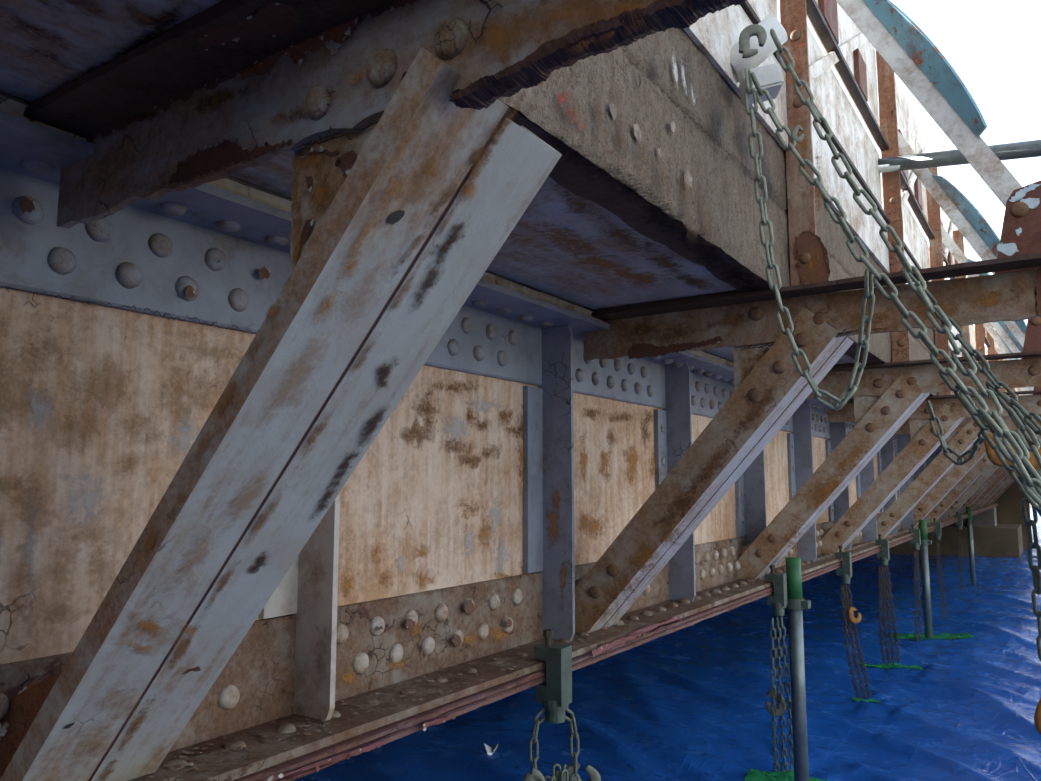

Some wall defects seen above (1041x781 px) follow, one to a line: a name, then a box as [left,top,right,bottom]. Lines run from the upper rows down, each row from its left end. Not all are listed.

crack [469,0,503,45]
peeling [162,137,357,185]
rust [392,0,746,309]
peeling [1009,183,1041,209]
peeling [296,218,314,259]
rust [794,231,831,285]
peeling [997,227,1022,256]
rust [378,360,398,387]
rust [362,410,385,442]
rust [402,382,477,449]
rust [312,454,357,519]
rust [585,389,774,615]